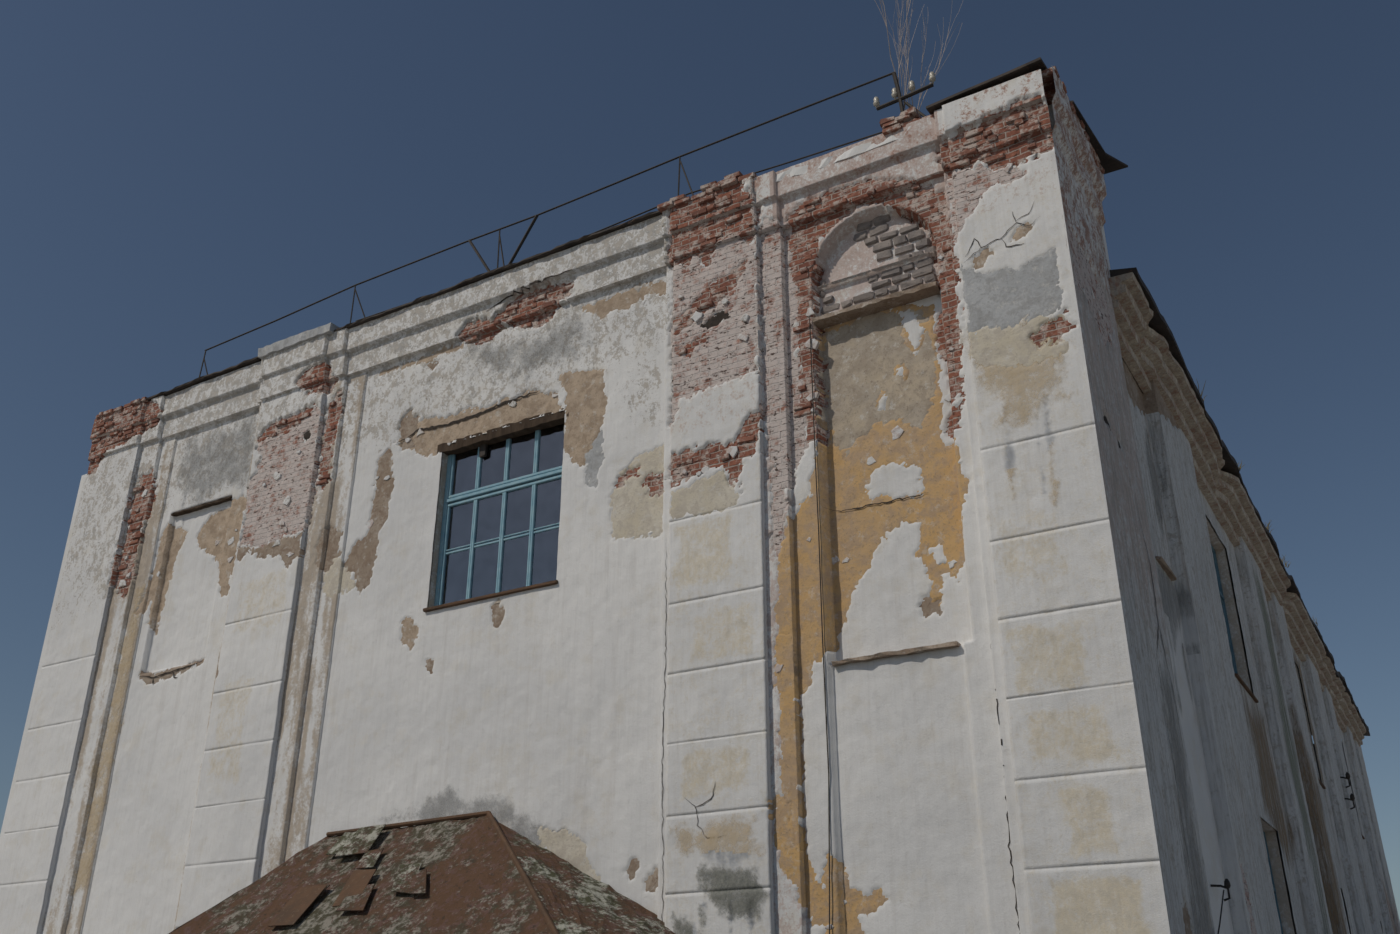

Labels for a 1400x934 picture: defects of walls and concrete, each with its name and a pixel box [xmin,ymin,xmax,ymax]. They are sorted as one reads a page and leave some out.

crack [966,205,1040,261]
peeling [109,93,1076,635]
spalling [1063,216,1180,429]
spalling [88,401,163,475]
peeling [139,659,219,685]
peeling [774,633,808,851]
damp [674,823,767,934]